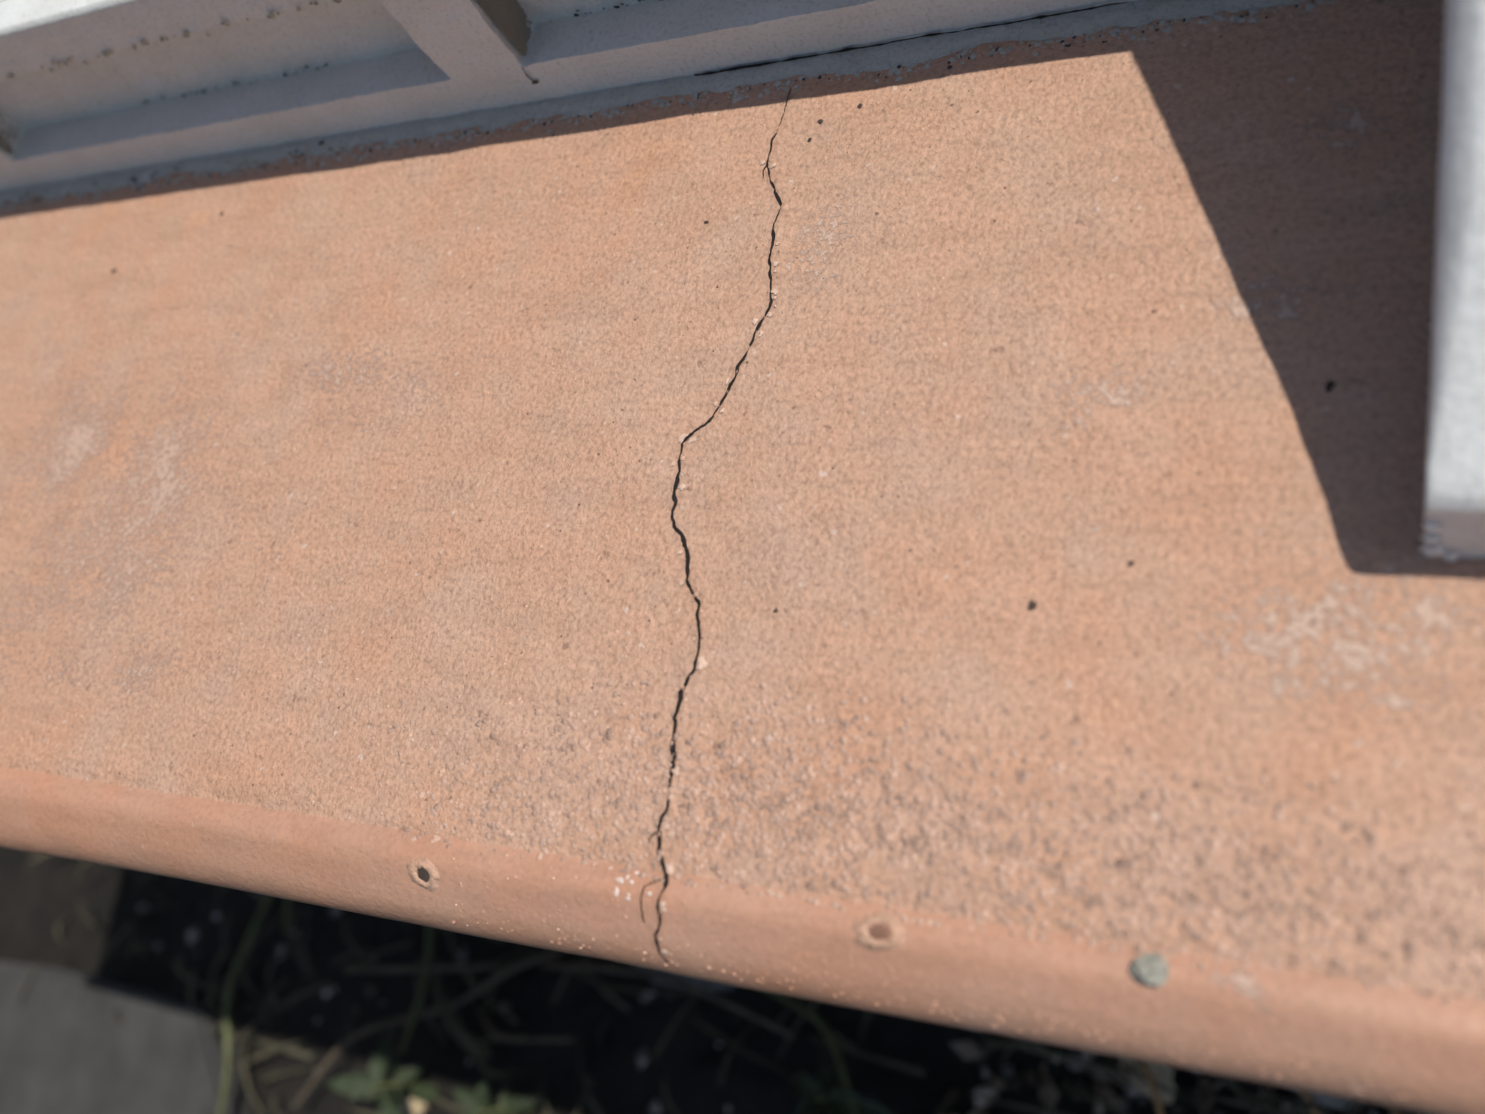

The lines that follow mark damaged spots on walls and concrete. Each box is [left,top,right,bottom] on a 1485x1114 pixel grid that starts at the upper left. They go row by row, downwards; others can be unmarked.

crack [640,88,791,963]